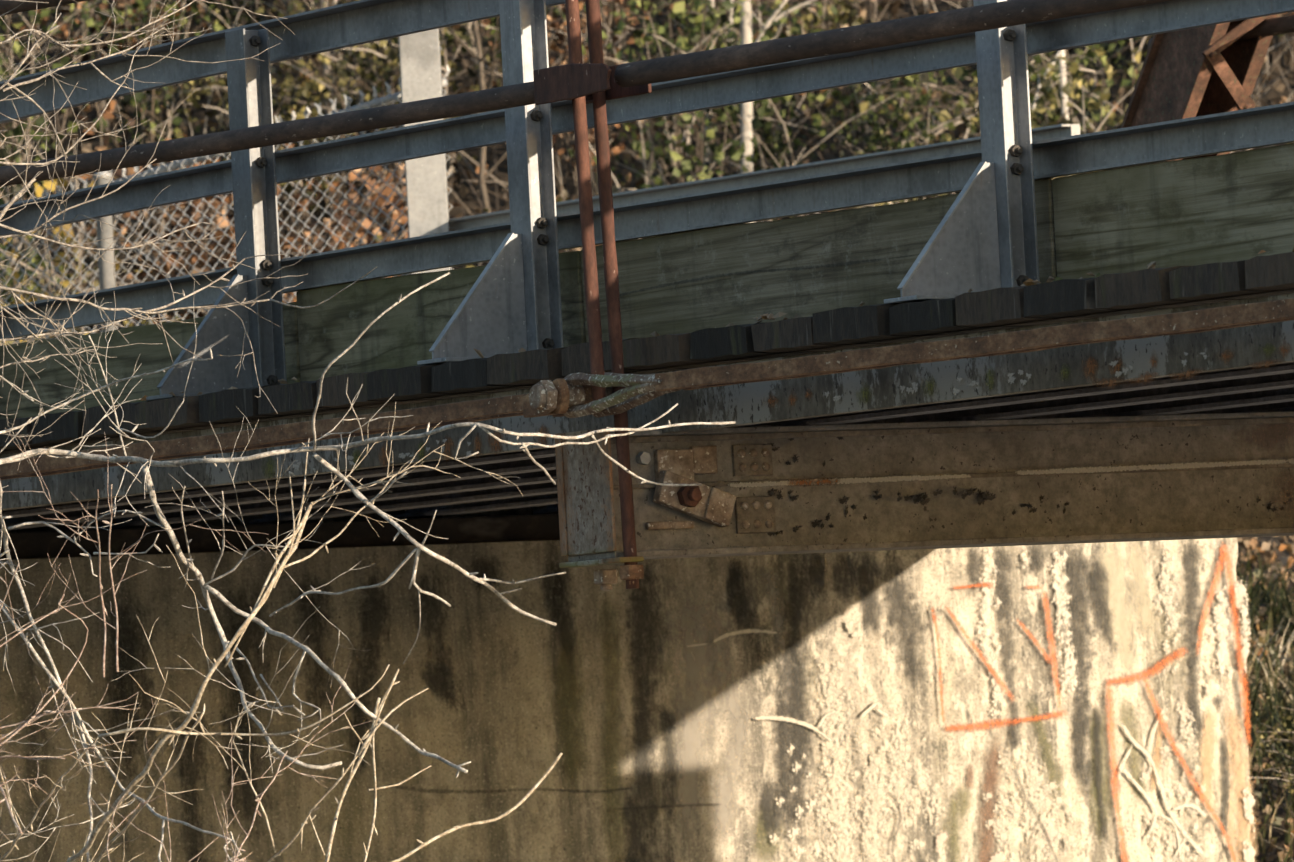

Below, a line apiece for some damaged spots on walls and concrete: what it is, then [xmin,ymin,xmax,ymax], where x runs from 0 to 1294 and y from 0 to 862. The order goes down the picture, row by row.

rust [475,431,502,456]
peeling [1007,370,1031,385]
damp [106,608,156,776]
damp [179,713,210,862]
damp [222,591,274,830]
damp [350,575,390,771]
damp [416,569,457,707]
damp [477,560,498,588]
damp [758,553,925,859]
damp [968,550,1060,792]
damp [1067,551,1111,837]
damp [1184,544,1204,737]